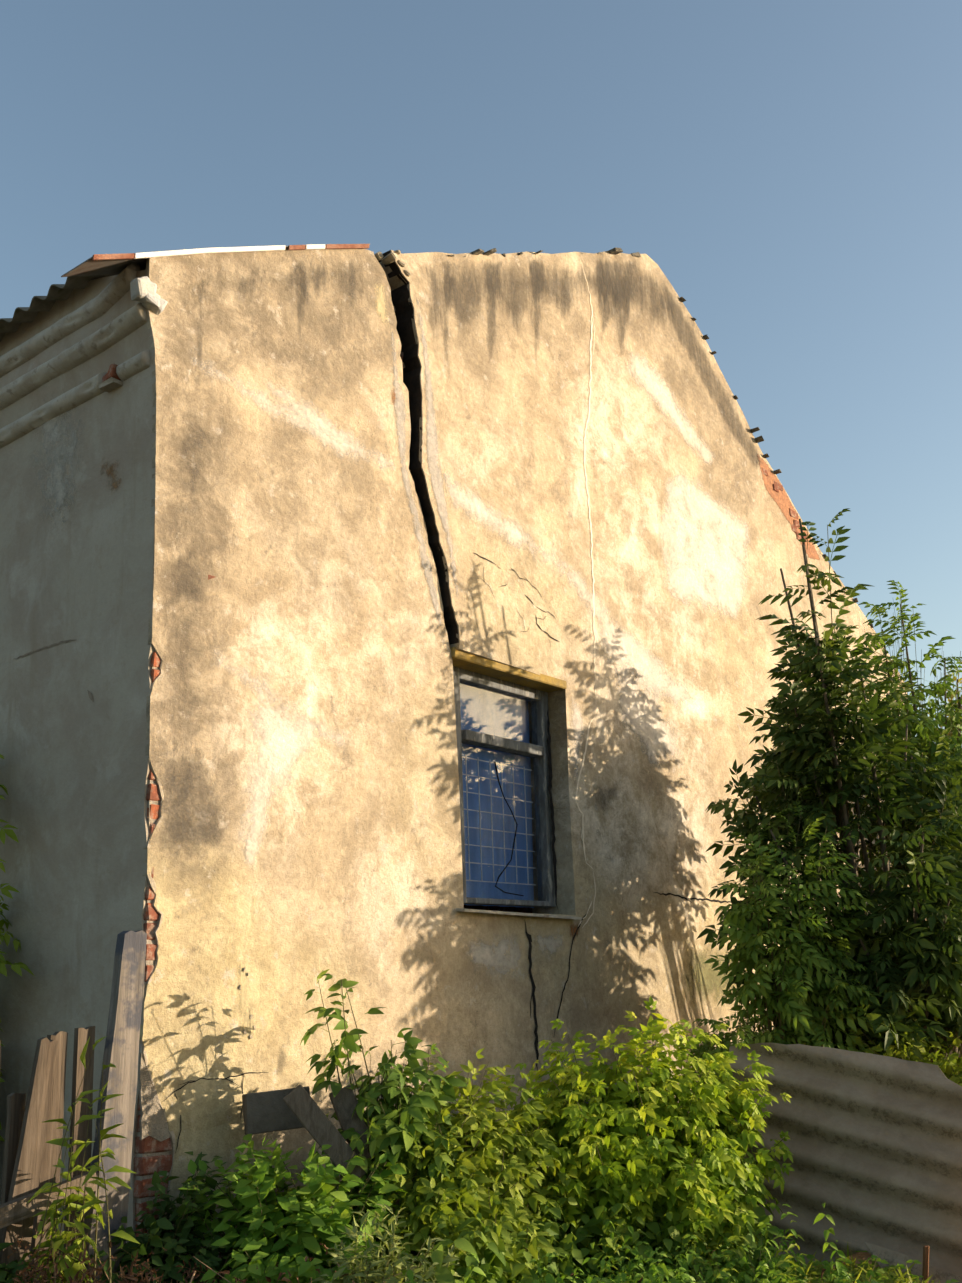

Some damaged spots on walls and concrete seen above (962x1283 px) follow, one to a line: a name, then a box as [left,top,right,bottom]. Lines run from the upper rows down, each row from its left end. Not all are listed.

leakage [433,265,519,318]
leakage [530,261,758,463]
crack [374,250,560,645]
spalling [146,643,164,697]
crack [524,263,596,1070]
spalling [143,759,164,848]
spalling [143,867,164,984]
crack [164,1072,268,1153]